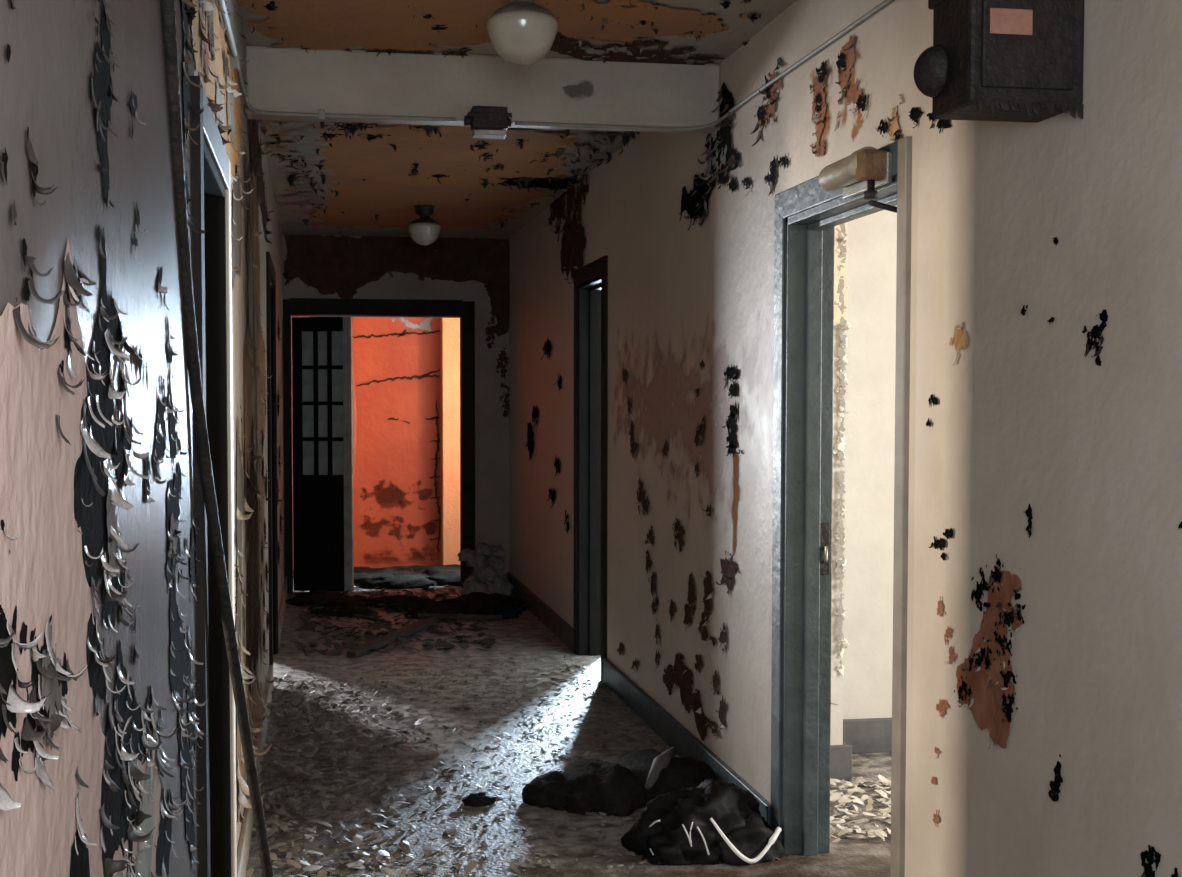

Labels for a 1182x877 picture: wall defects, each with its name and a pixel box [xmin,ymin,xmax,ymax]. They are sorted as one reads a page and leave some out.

peeling [26,126,57,205]
peeling [90,0,146,208]
peeling [679,82,788,230]
peeling [750,57,782,147]
peeling [809,35,868,162]
peeling [875,94,952,141]
crack [352,330,440,338]
peeling [181,0,640,823]
peeling [722,364,741,458]
peeling [0,225,209,877]
peeling [636,478,737,741]
peeling [936,554,1026,752]